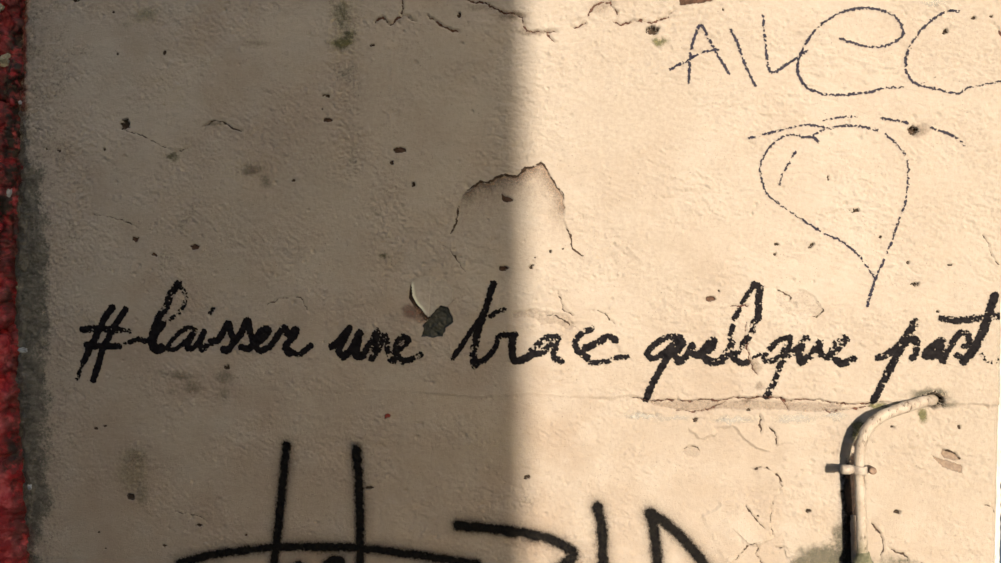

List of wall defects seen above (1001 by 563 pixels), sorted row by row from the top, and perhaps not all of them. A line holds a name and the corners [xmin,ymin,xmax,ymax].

crack [375,0,458,32]
crack [468,0,669,42]
peeling [464,162,565,212]
crack [632,304,870,444]
crack [735,506,782,563]